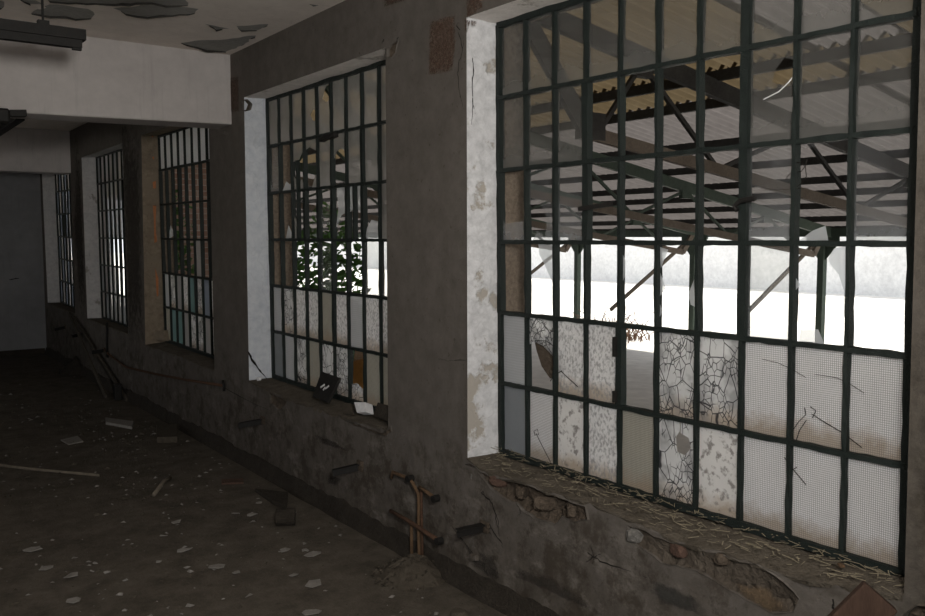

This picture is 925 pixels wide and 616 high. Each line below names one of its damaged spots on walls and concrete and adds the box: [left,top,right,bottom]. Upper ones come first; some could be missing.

peeling [18,0,198,21]
peeling [180,24,268,53]
crack [586,547,647,578]